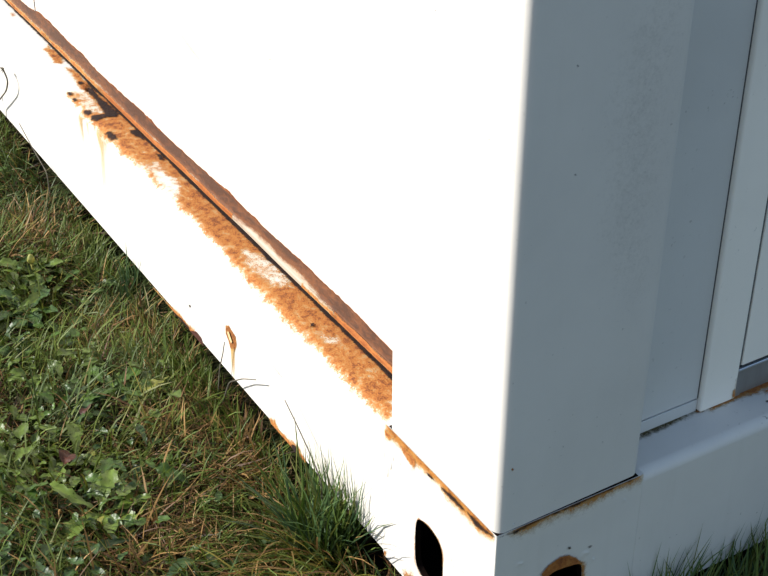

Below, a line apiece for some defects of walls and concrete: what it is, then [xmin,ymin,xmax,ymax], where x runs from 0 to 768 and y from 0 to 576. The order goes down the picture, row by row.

rust [4,0,493,540]
rust [710,382,768,411]
rust [507,476,641,535]
rust [542,555,585,576]